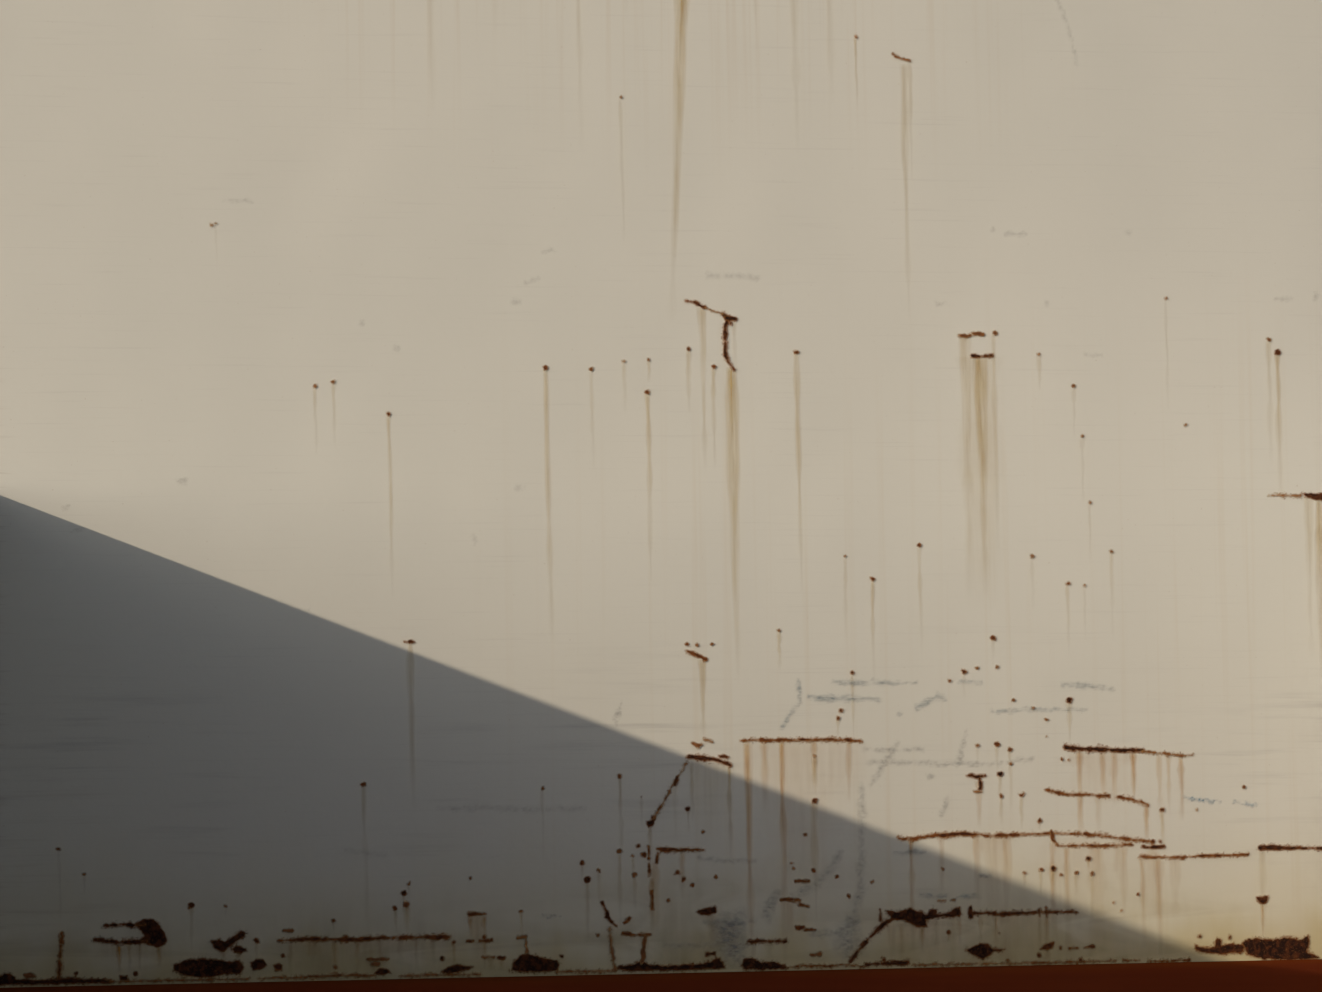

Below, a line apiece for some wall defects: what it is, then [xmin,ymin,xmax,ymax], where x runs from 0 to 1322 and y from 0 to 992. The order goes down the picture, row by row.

rust [697,906,717,916]
rust [93,919,167,955]
rust [0,930,481,986]
rust [509,935,725,974]
rust [741,957,865,971]
rust [914,932,1319,967]